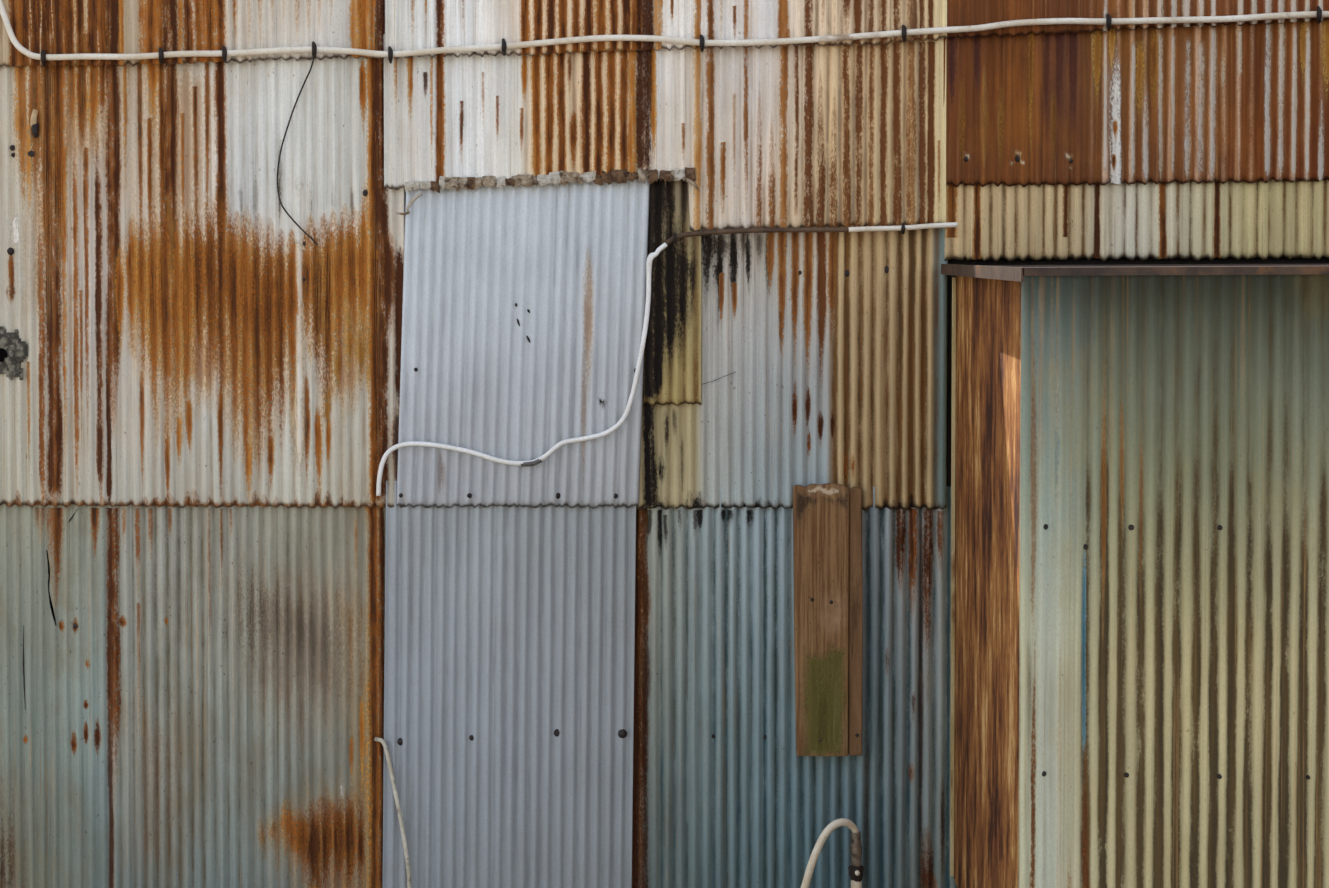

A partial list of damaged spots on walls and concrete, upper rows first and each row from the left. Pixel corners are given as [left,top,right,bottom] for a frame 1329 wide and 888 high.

rust [520,0,674,176]
rust [682,0,726,230]
rust [1136,30,1158,114]
rust [1300,19,1329,96]
rust [733,0,981,367]
rust [1159,183,1167,258]
rust [719,273,737,319]
rust [8,0,464,888]
rust [896,508,943,644]
rust [632,507,650,888]
rust [921,792,944,888]
rust [1081,754,1089,888]